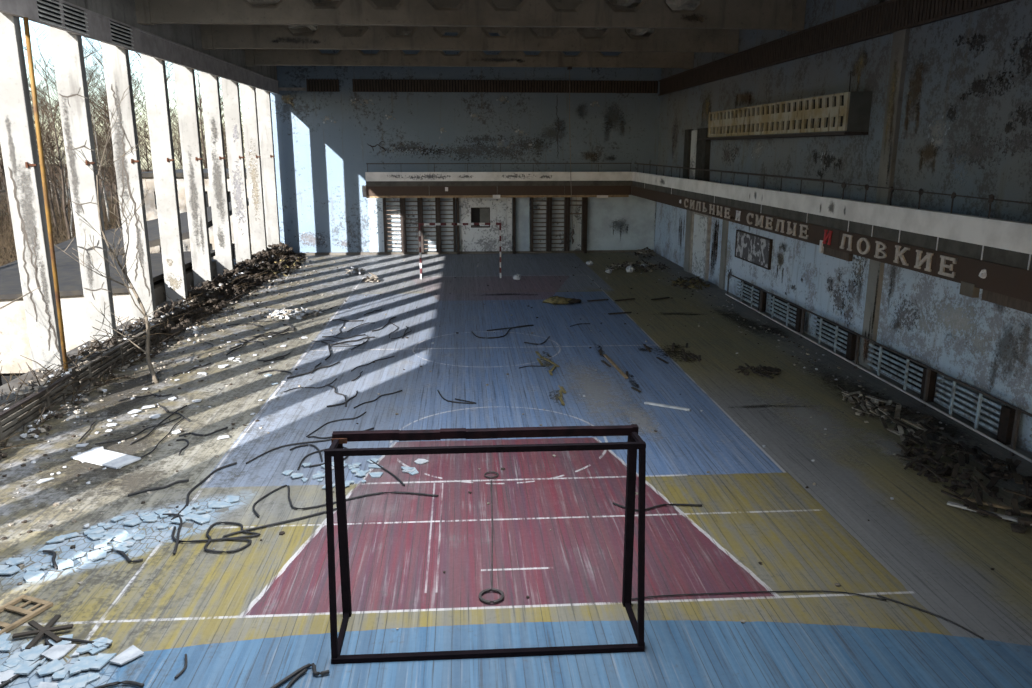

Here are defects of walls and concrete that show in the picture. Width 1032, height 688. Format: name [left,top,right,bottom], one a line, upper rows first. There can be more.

damp [884,54,924,173]
spalling [827,256,868,327]